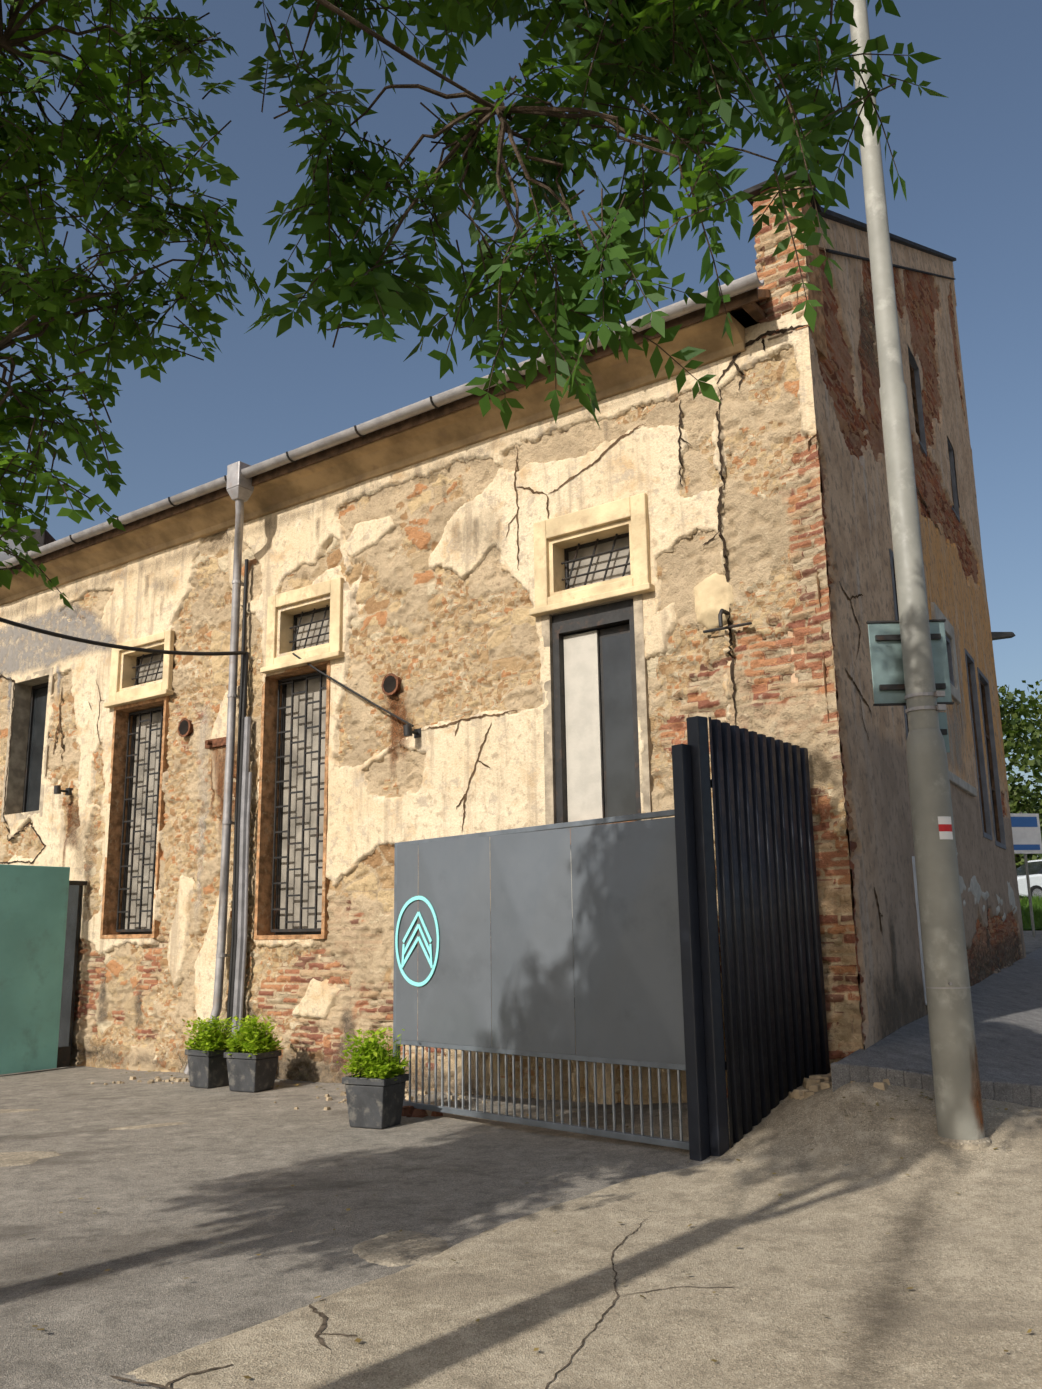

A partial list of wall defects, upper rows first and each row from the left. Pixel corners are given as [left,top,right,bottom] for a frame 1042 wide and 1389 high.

flaking render [0,676,44,864]
flaking render [47,242,885,1105]
crack [421,710,517,832]
crack [506,325,808,725]
flaking render [893,267,978,583]
flaking render [959,875,1021,985]